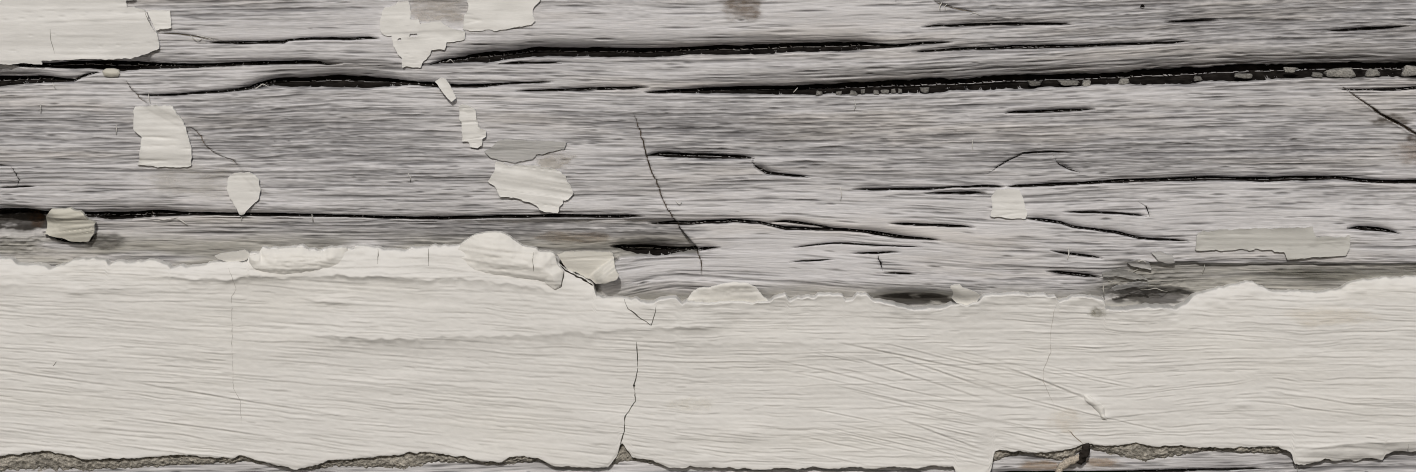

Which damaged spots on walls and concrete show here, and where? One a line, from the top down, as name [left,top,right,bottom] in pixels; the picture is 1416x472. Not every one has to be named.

peeling [380,0,540,68]
spalling [1283,67,1380,78]
peeling [133,105,192,168]
crack [0,1,1416,278]
peeling [227,172,261,215]
peeling [488,161,573,213]
crack [532,252,593,289]
peeling [557,250,619,284]
crack [620,299,656,444]
spalling [0,451,545,472]
spalling [611,444,664,466]
spalling [993,443,1290,462]